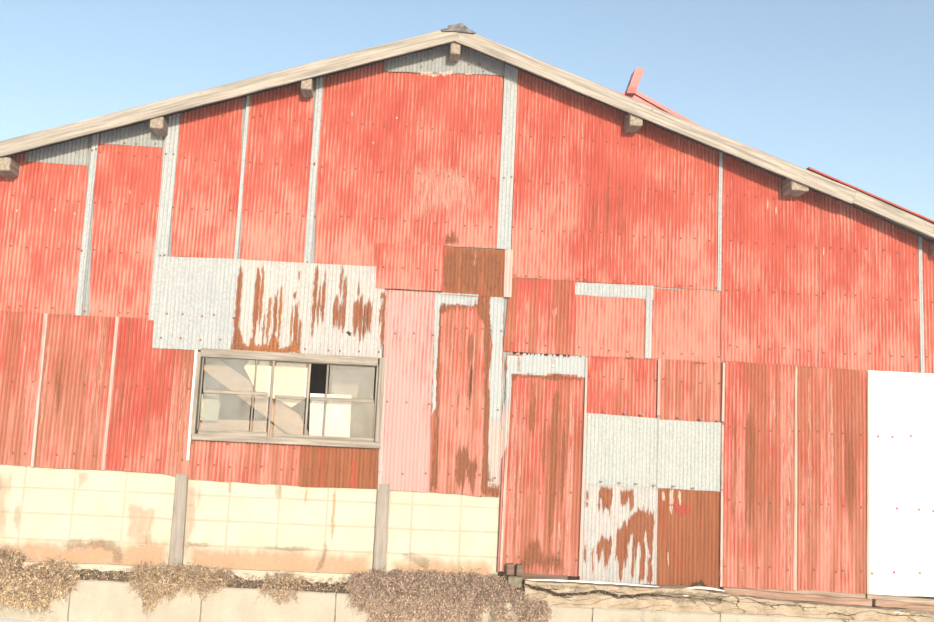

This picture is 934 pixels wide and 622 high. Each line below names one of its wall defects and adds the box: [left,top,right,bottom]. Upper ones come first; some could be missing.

rust [230,266,386,353]
rust [431,231,501,497]
rust [505,358,583,572]
rust [732,411,757,528]
rust [844,412,855,527]
rust [584,486,655,584]